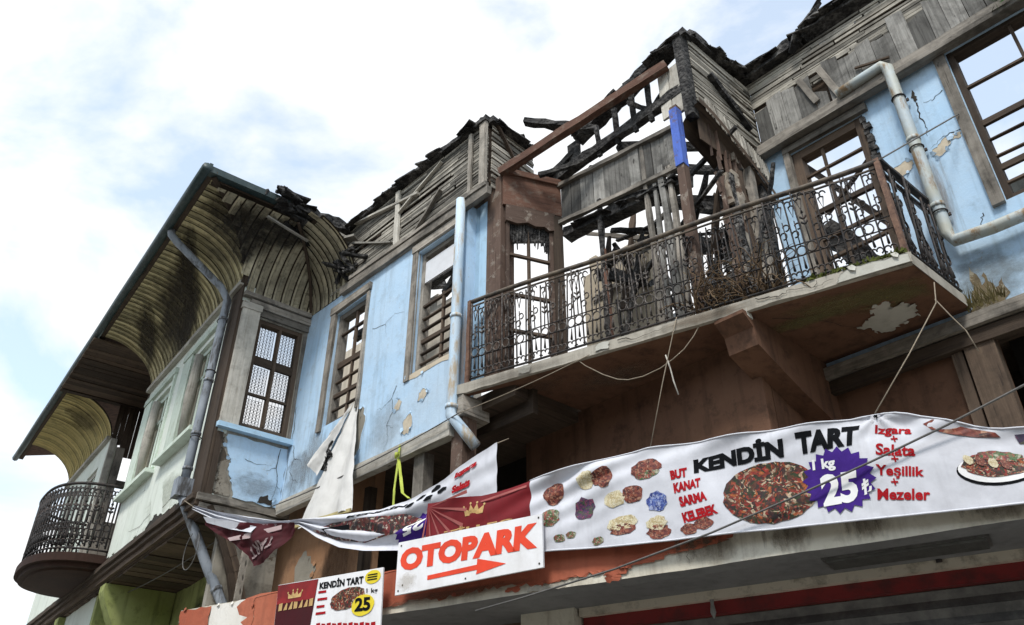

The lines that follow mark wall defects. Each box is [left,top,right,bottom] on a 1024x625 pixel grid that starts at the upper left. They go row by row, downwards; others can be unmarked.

peeling [894,158,914,176]
crack [916,90,960,147]
peeling [929,130,961,160]
damp [137,305,155,367]
damp [179,229,199,350]
peeling [855,300,921,334]
spalling [392,354,449,436]
spalling [212,430,231,496]
crack [247,410,302,496]
spalling [257,495,277,506]
peeling [383,534,733,608]
peeling [178,591,278,625]